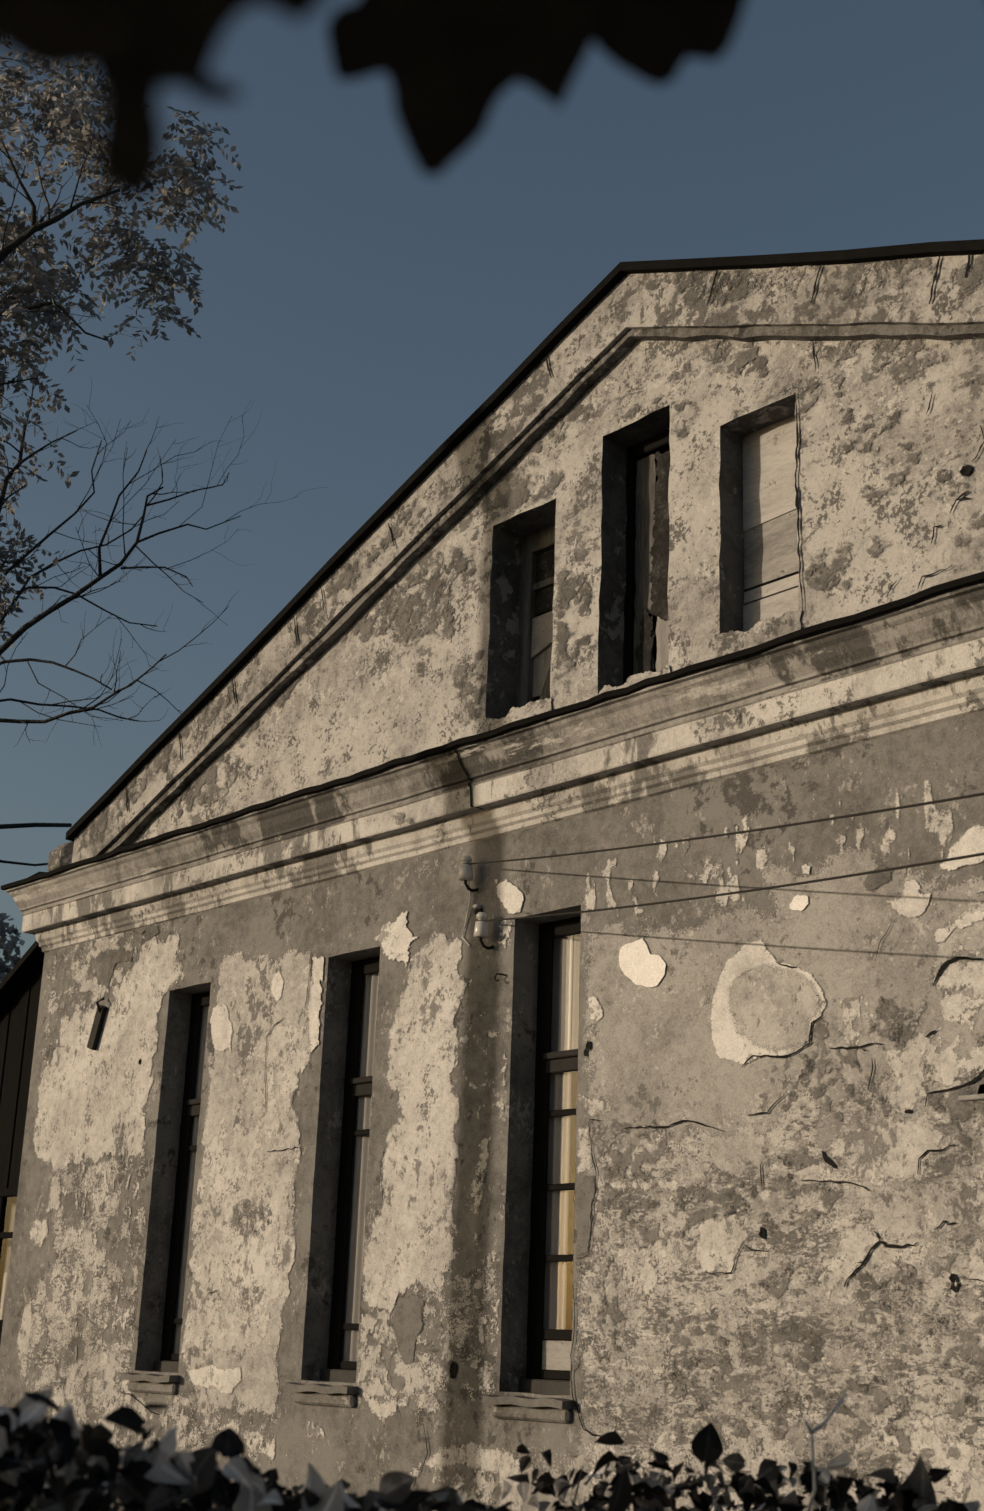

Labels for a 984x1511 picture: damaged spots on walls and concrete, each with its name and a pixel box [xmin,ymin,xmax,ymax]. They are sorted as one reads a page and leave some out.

peeling [579,815,767,916]
peeling [923,780,984,871]
peeling [619,939,666,987]
peeling [709,898,984,1300]
crack [925,1070,984,1106]
peeling [29,904,190,1466]
peeling [180,956,324,1394]
peeling [356,911,508,1423]
crack [801,1151,869,1191]
crack [917,1144,955,1174]
crack [844,1220,957,1287]
peeling [408,1440,523,1511]